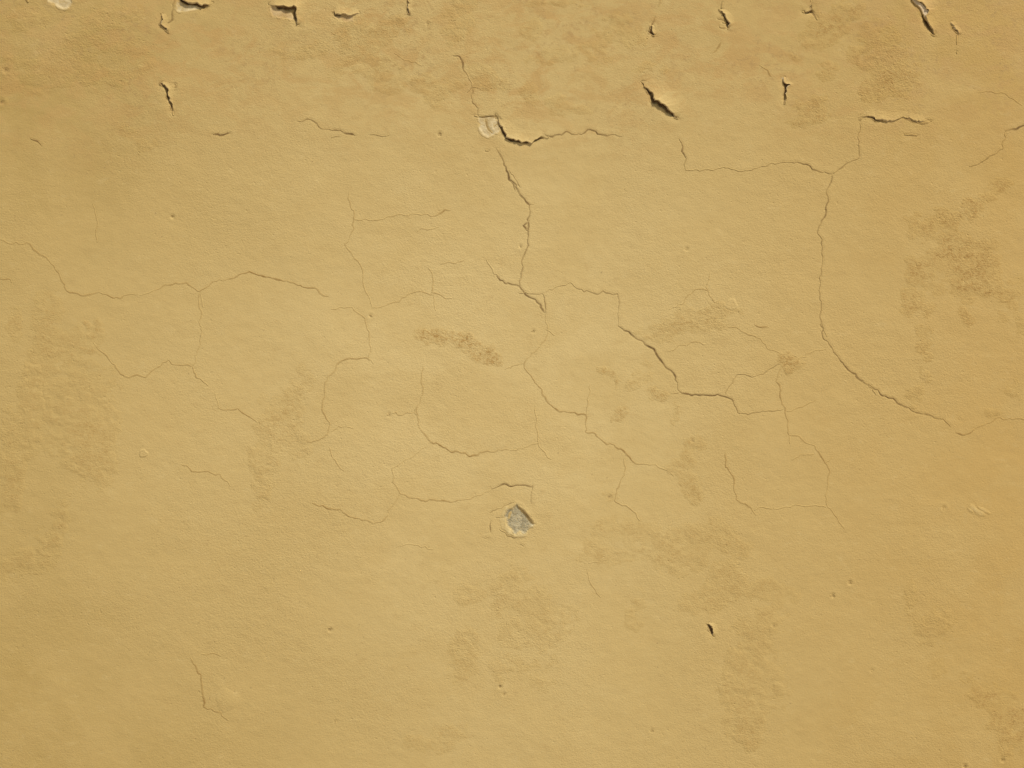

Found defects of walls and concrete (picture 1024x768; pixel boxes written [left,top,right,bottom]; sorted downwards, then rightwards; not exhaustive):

peeling [268,0,308,25]
peeling [911,0,962,54]
peeling [159,81,177,115]
peeling [640,78,687,119]
crack [297,118,389,138]
peeling [474,114,549,152]
crack [969,90,1024,167]
crack [0,123,1024,546]
spalling [499,502,535,539]